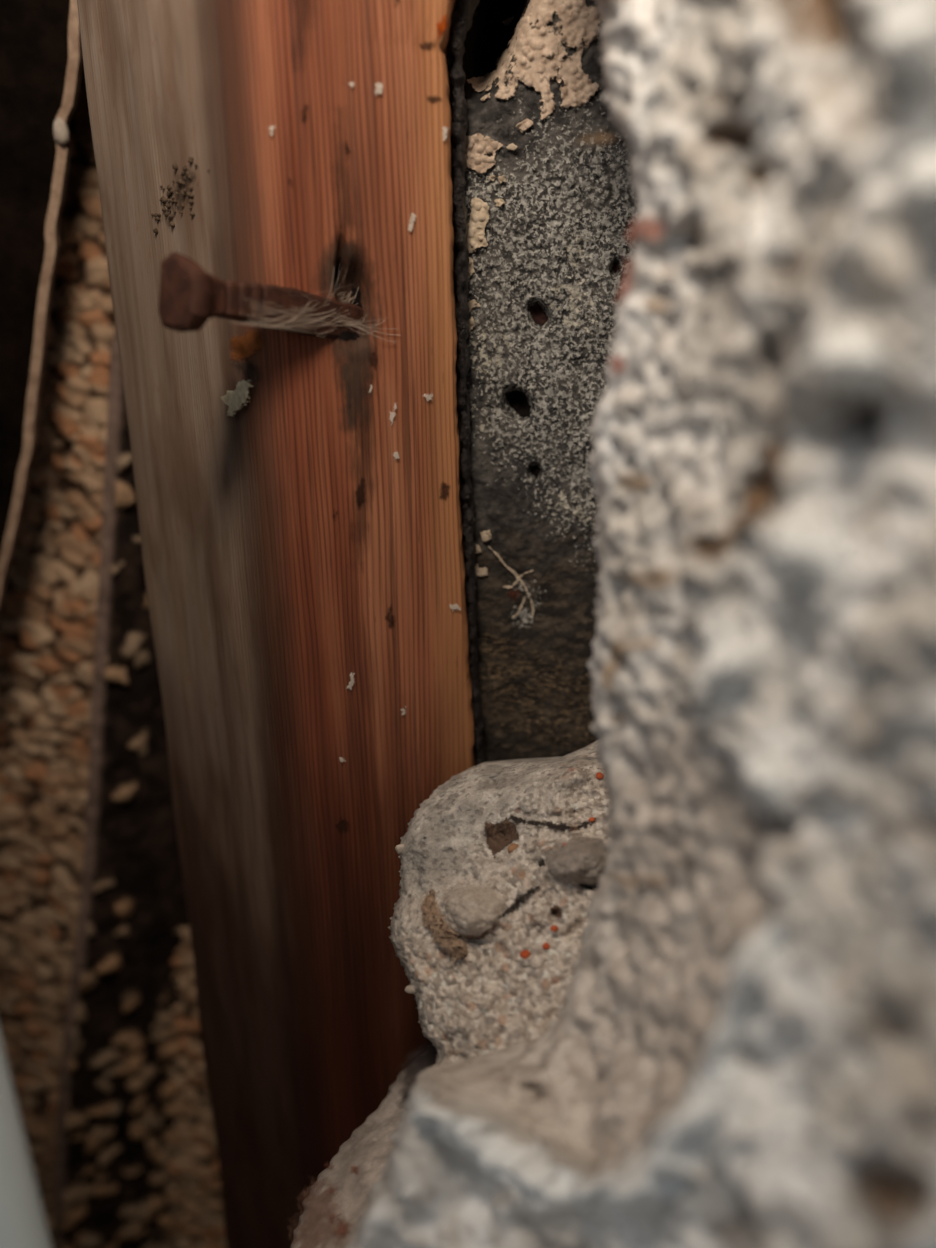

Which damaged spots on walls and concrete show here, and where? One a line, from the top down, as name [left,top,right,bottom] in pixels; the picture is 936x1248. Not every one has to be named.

flaking render [465,0,604,183]
peeling [466,197,505,281]
peeling [468,299,480,331]
peeling [472,510,492,576]
crack [508,814,596,832]
crack [459,860,598,940]